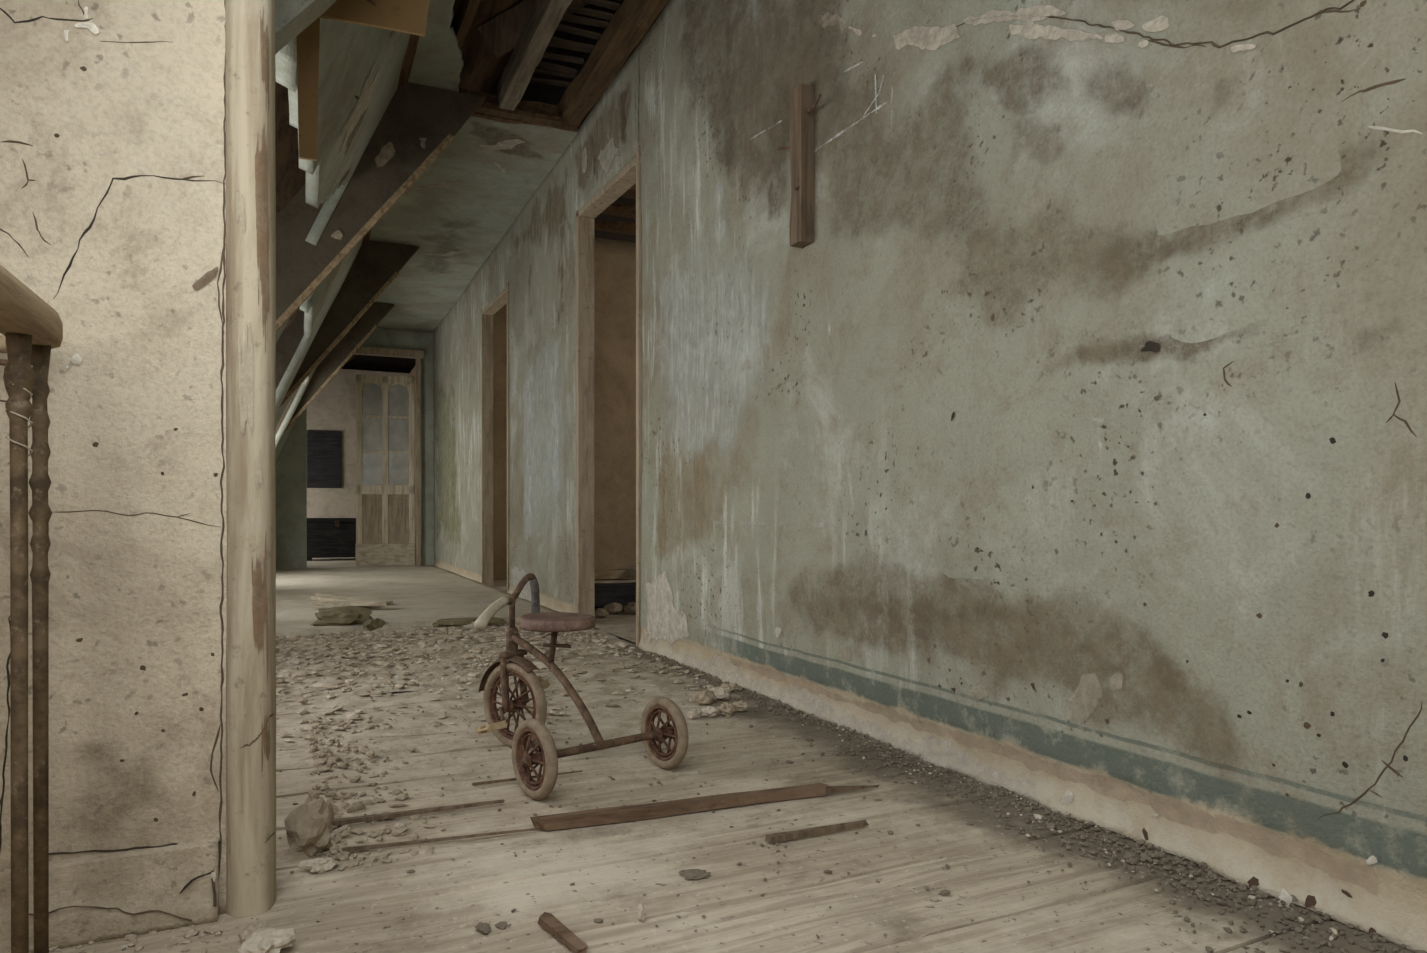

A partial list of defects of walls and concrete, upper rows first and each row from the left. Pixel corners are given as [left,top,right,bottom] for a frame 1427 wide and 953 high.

crack [0,0,167,43]
crack [893,0,1360,53]
crack [0,68,274,921]
damp [792,571,1232,761]
crack [1319,703,1422,818]